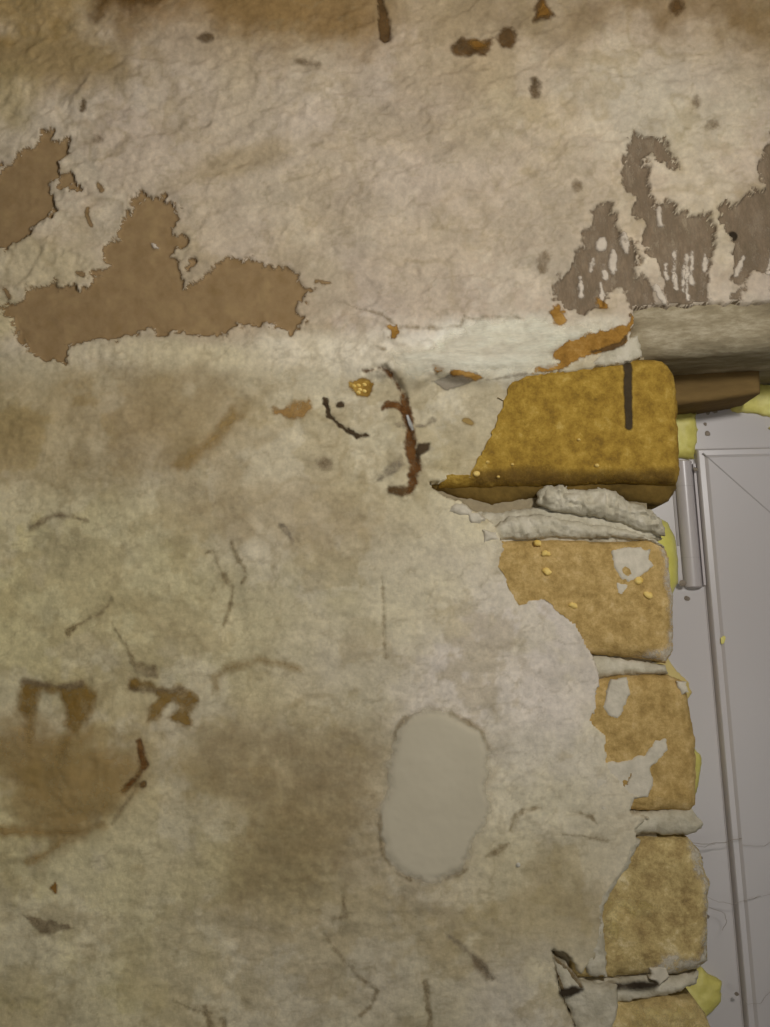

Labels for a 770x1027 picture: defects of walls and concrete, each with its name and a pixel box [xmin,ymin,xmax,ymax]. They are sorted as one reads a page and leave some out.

peeling [0,127,83,250]
peeling [0,190,331,366]
flaking render [505,131,770,378]
spalling [432,364,483,390]
water stain [0,727,138,846]
spalling [554,956,583,997]